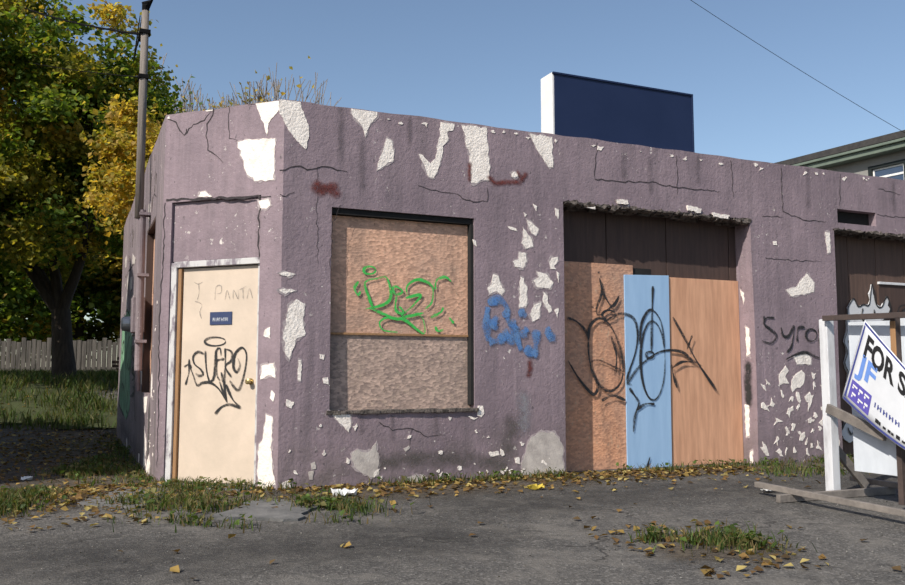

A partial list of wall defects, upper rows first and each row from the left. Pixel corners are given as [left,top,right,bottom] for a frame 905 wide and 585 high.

crack [168,106,236,161]
peeling [237,99,309,183]
peeling [350,109,403,138]
peeling [376,136,395,171]
peeling [418,121,557,186]
peeling [508,204,559,323]
peeling [277,270,306,382]
peeling [138,364,155,475]
peeling [255,413,297,489]
peeling [346,441,386,480]
peeling [500,429,565,476]
peeling [749,354,823,463]